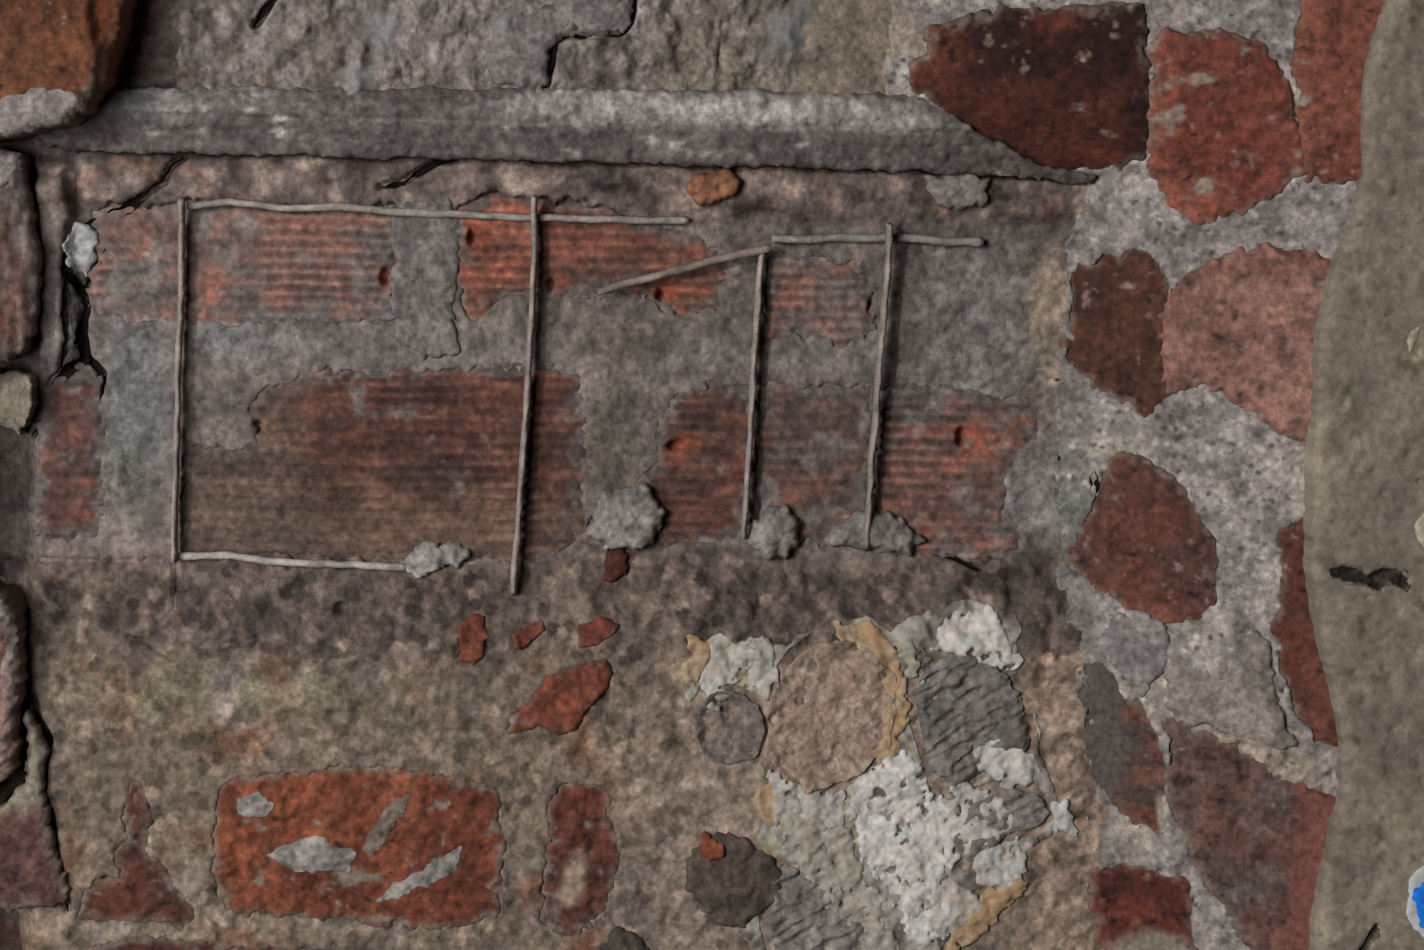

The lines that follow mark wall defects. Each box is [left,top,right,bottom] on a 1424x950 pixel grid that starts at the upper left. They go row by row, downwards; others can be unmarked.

spalling [176,0,892,96]
crack [545,0,635,88]